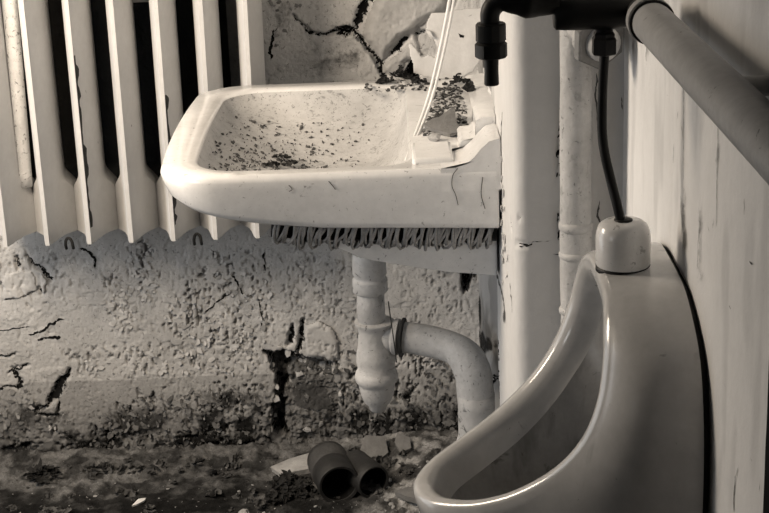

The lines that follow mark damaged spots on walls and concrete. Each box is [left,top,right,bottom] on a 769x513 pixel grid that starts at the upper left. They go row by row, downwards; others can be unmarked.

crack [268,29,277,59]
crack [294,0,426,74]
peeling [499,175,508,285]
crack [5,256,54,300]
spalling [461,273,479,295]
crack [0,318,64,341]
crack [288,319,305,355]
crack [0,353,28,390]
crack [39,368,71,417]
crack [10,441,30,452]